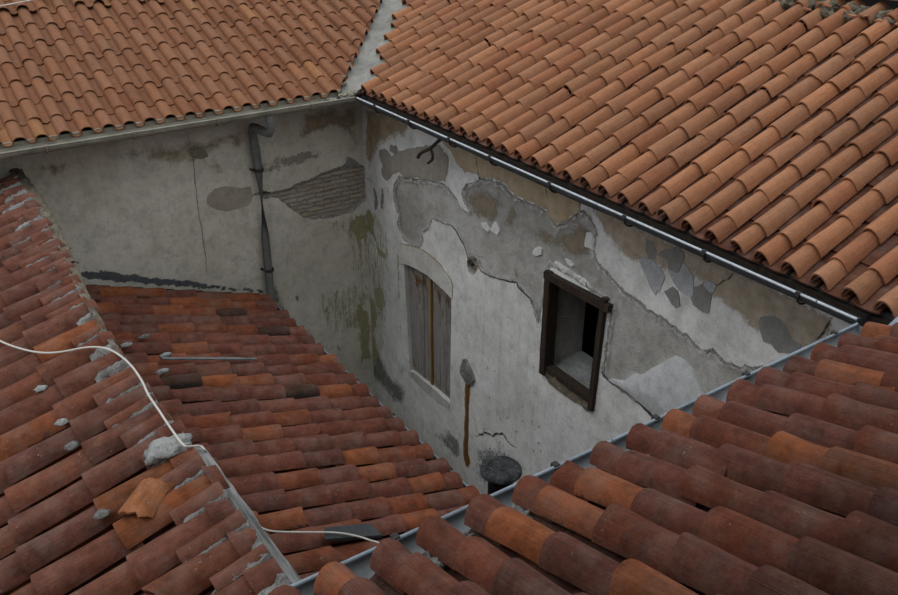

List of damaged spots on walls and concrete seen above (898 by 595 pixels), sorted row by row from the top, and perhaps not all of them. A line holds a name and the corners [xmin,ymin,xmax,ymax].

flaking render [263,157,366,219]
water stain [323,215,403,400]
flaking render [393,176,763,411]
crack [474,429,515,447]